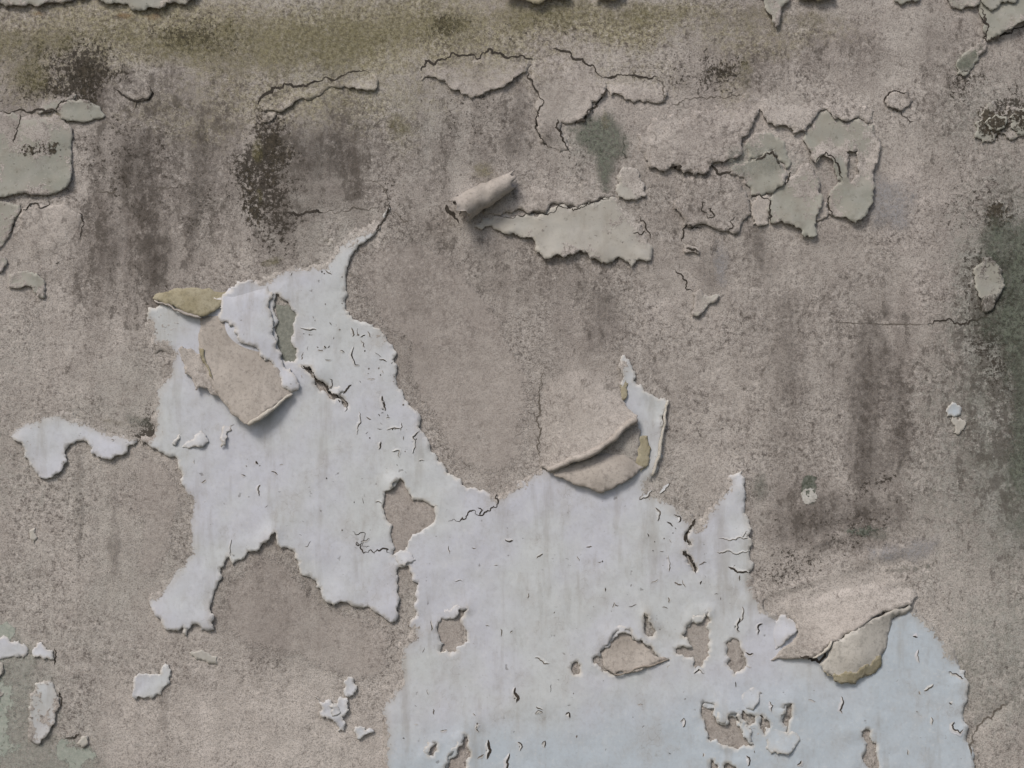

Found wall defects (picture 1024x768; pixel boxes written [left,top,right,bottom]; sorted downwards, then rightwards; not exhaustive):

water stain [159,25,249,57]
mould [43,58,122,104]
peeling [258,74,378,123]
peeling [421,55,668,152]
peeling [974,101,1024,143]
peeling [0,93,105,298]
mould [236,117,294,228]
peeling [449,92,881,267]
water stain [985,197,1015,260]
peeling [10,208,975,768]
peeling [0,635,54,676]